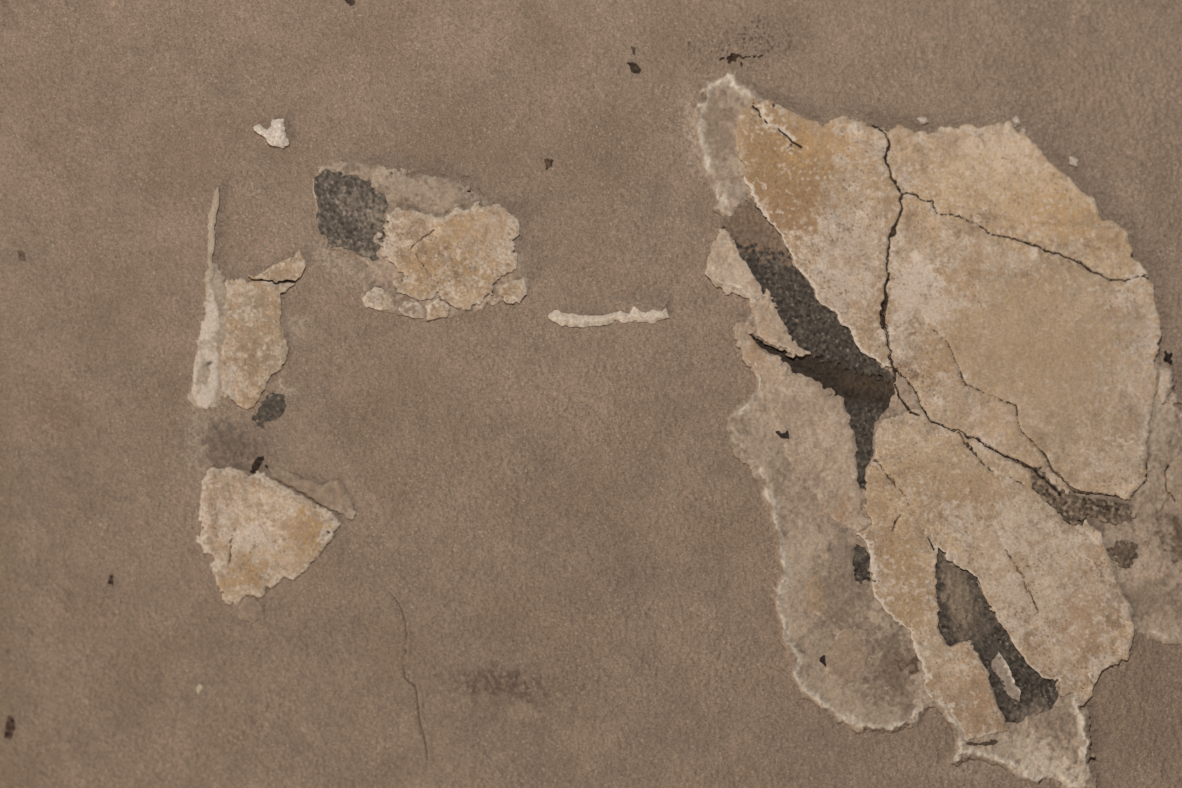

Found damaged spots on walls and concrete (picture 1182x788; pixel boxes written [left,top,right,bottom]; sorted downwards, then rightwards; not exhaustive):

crack [751,102,802,148]
flaking render [187,187,306,429]
flaking render [312,161,529,321]
crack [871,125,1175,502]
flaking render [196,456,357,623]
crack [873,459,908,531]
flaking render [691,69,1182,788]
crack [1004,549,1038,613]